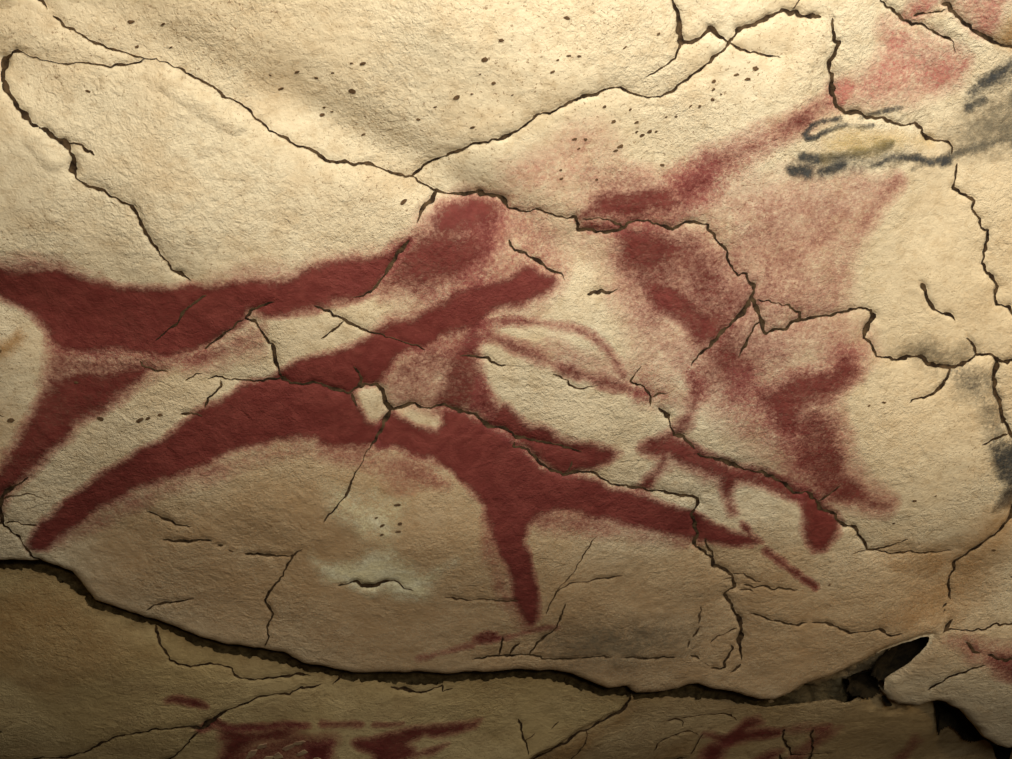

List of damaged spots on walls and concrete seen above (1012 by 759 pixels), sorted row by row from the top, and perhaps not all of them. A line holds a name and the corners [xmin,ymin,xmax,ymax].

crack [1,0,1012,445]
crack [0,477,43,560]
crack [140,301,902,673]
crack [630,366,1012,690]
crack [33,598,342,759]
crack [391,684,453,693]
crack [518,695,631,759]
crack [655,713,737,759]
spalling [846,636,929,706]
spalling [935,702,977,743]